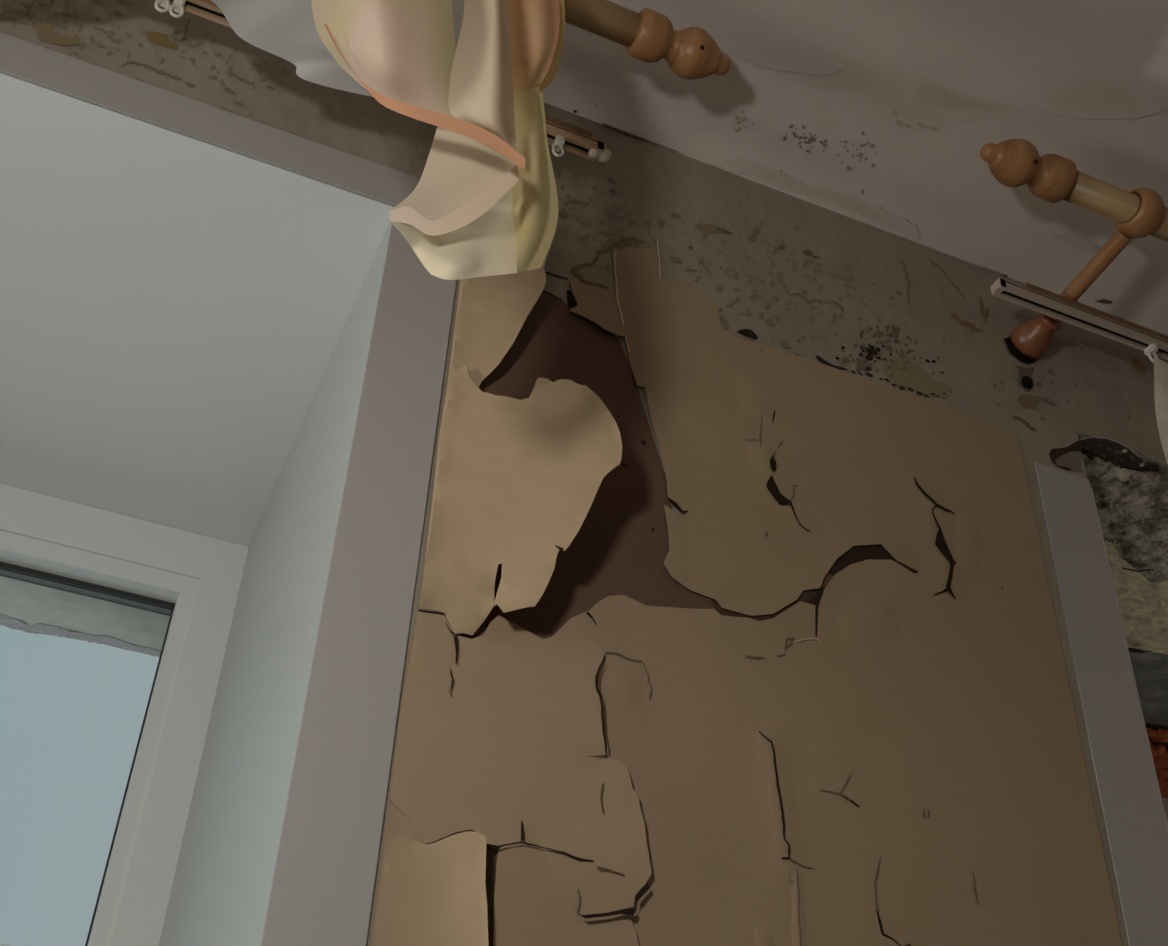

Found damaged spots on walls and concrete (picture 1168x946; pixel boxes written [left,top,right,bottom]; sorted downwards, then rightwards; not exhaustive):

leakage [554,175,681,289]
leakage [670,219,952,398]
leakage [783,124,876,170]
peeling [371,209,651,946]
crack [668,498,688,514]
crack [747,410,811,532]
crack [710,477,957,660]
spalling [1049,438,1168,654]
crack [759,731,814,946]
crack [874,857,911,946]